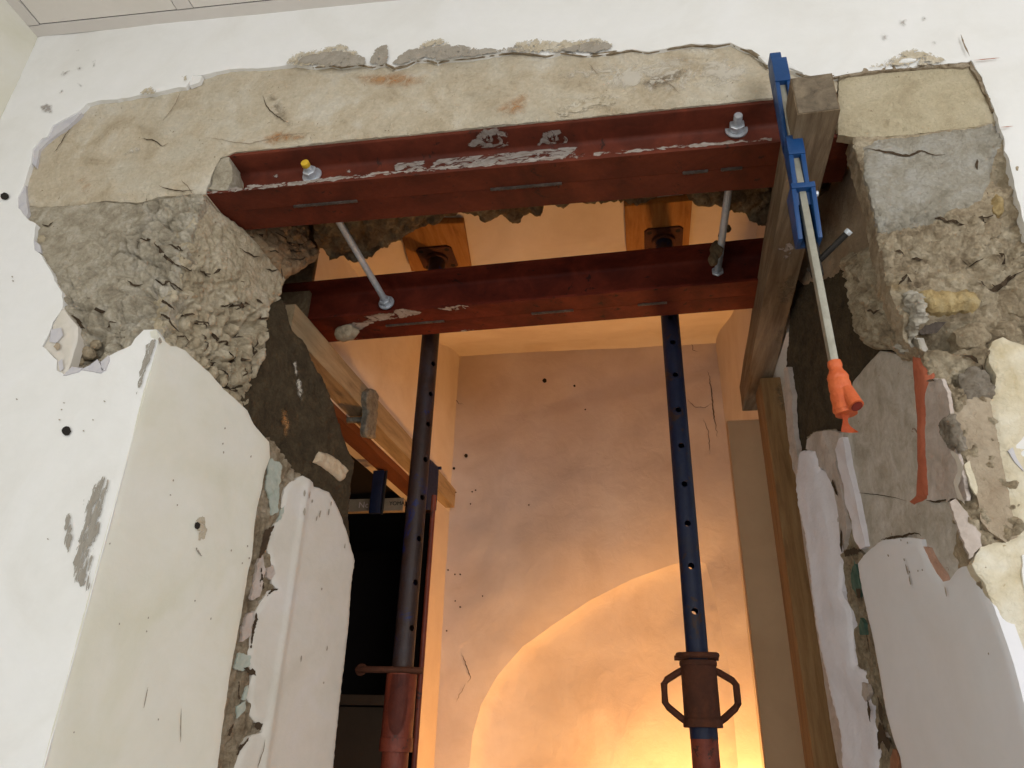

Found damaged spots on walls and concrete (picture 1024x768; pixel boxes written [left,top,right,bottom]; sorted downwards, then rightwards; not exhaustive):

flaking render [286,38,769,70]
flaking render [788,62,810,77]
peeling [32,112,84,169]
crack [208,97,312,144]
crack [867,148,945,157]
spalling [683,187,773,226]
spalling [832,48,1024,412]
spalling [19,185,569,406]
crack [688,373,717,450]
spalling [784,367,802,475]
peeling [64,477,109,592]
spalling [920,428,1024,582]